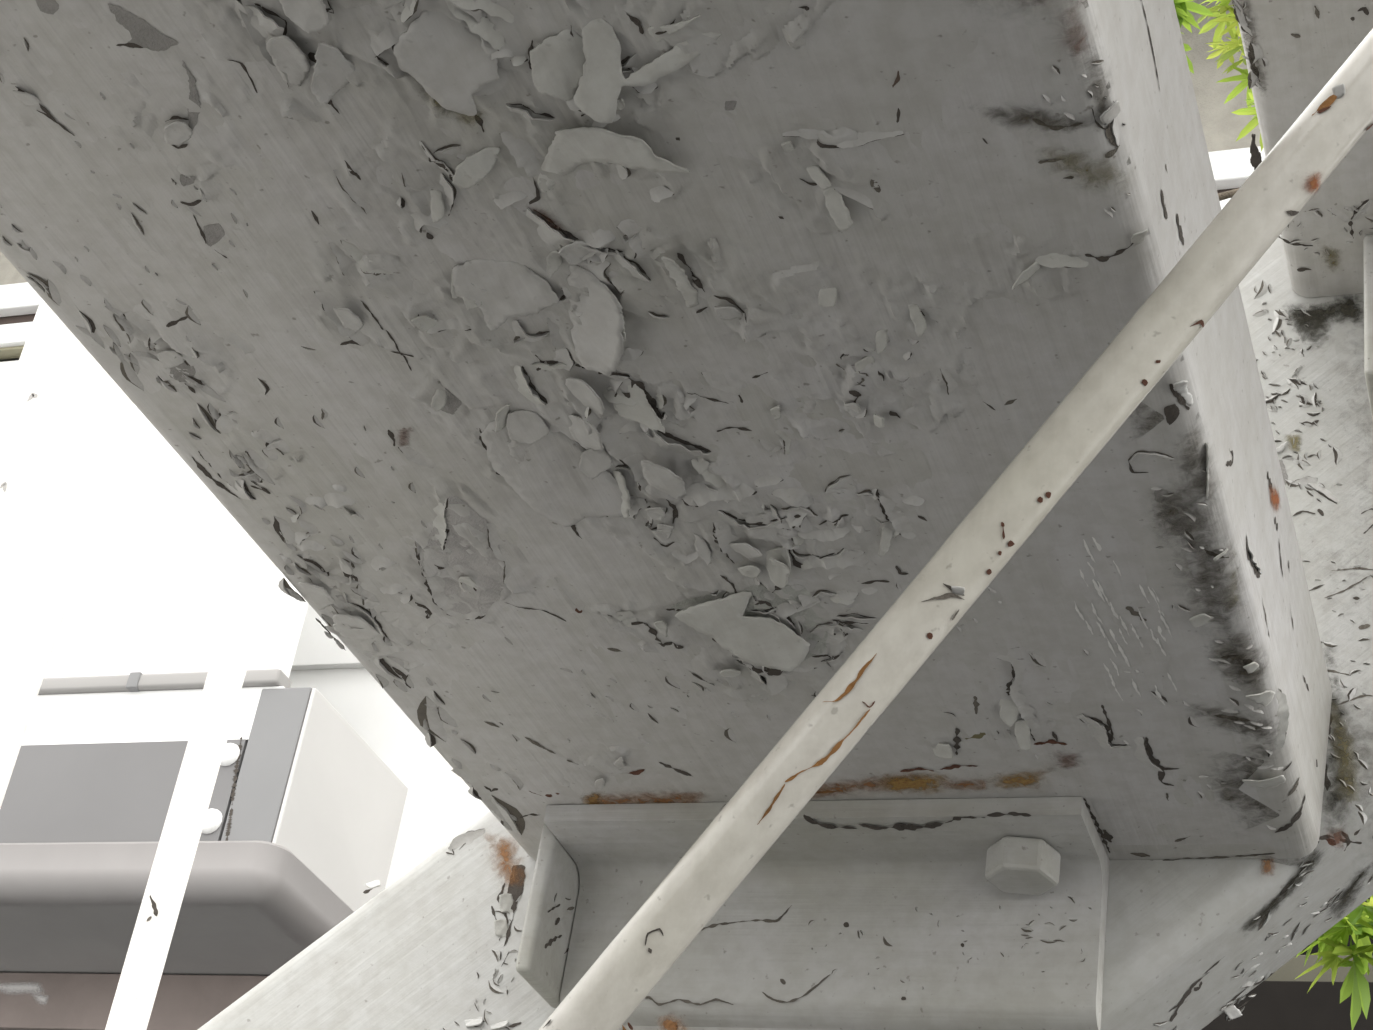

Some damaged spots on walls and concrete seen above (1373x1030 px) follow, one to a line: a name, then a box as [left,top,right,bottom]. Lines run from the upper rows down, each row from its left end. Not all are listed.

peeling [108,3,201,149]
peeling [234,0,355,114]
mould [994,60,1126,158]
peeling [368,0,900,712]
peeling [1253,280,1343,504]
mould [1128,442,1238,627]
rust [586,794,696,804]
rust [757,653,877,825]
rust [813,765,981,797]
rust [998,774,1038,788]
mould [1205,638,1275,736]
mould [1324,679,1368,820]